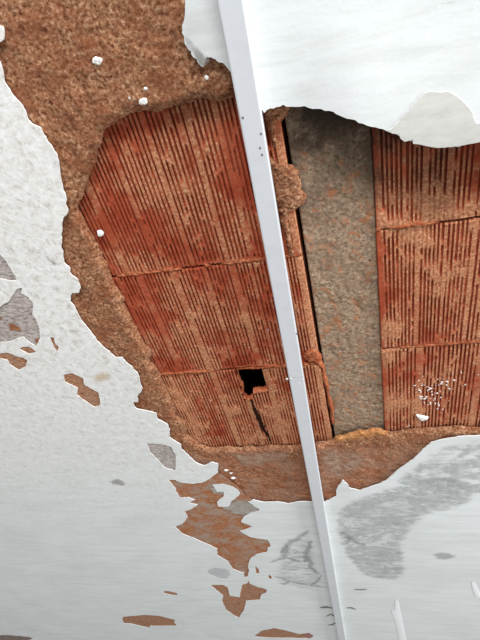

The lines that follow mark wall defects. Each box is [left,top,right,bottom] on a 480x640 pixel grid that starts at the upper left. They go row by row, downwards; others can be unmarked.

peeling [388,91,480,148]
spalling [0,0,312,617]
crack [250,399,271,442]
spalling [315,425,480,501]
leakage [338,445,480,579]
peeling [122,615,177,627]